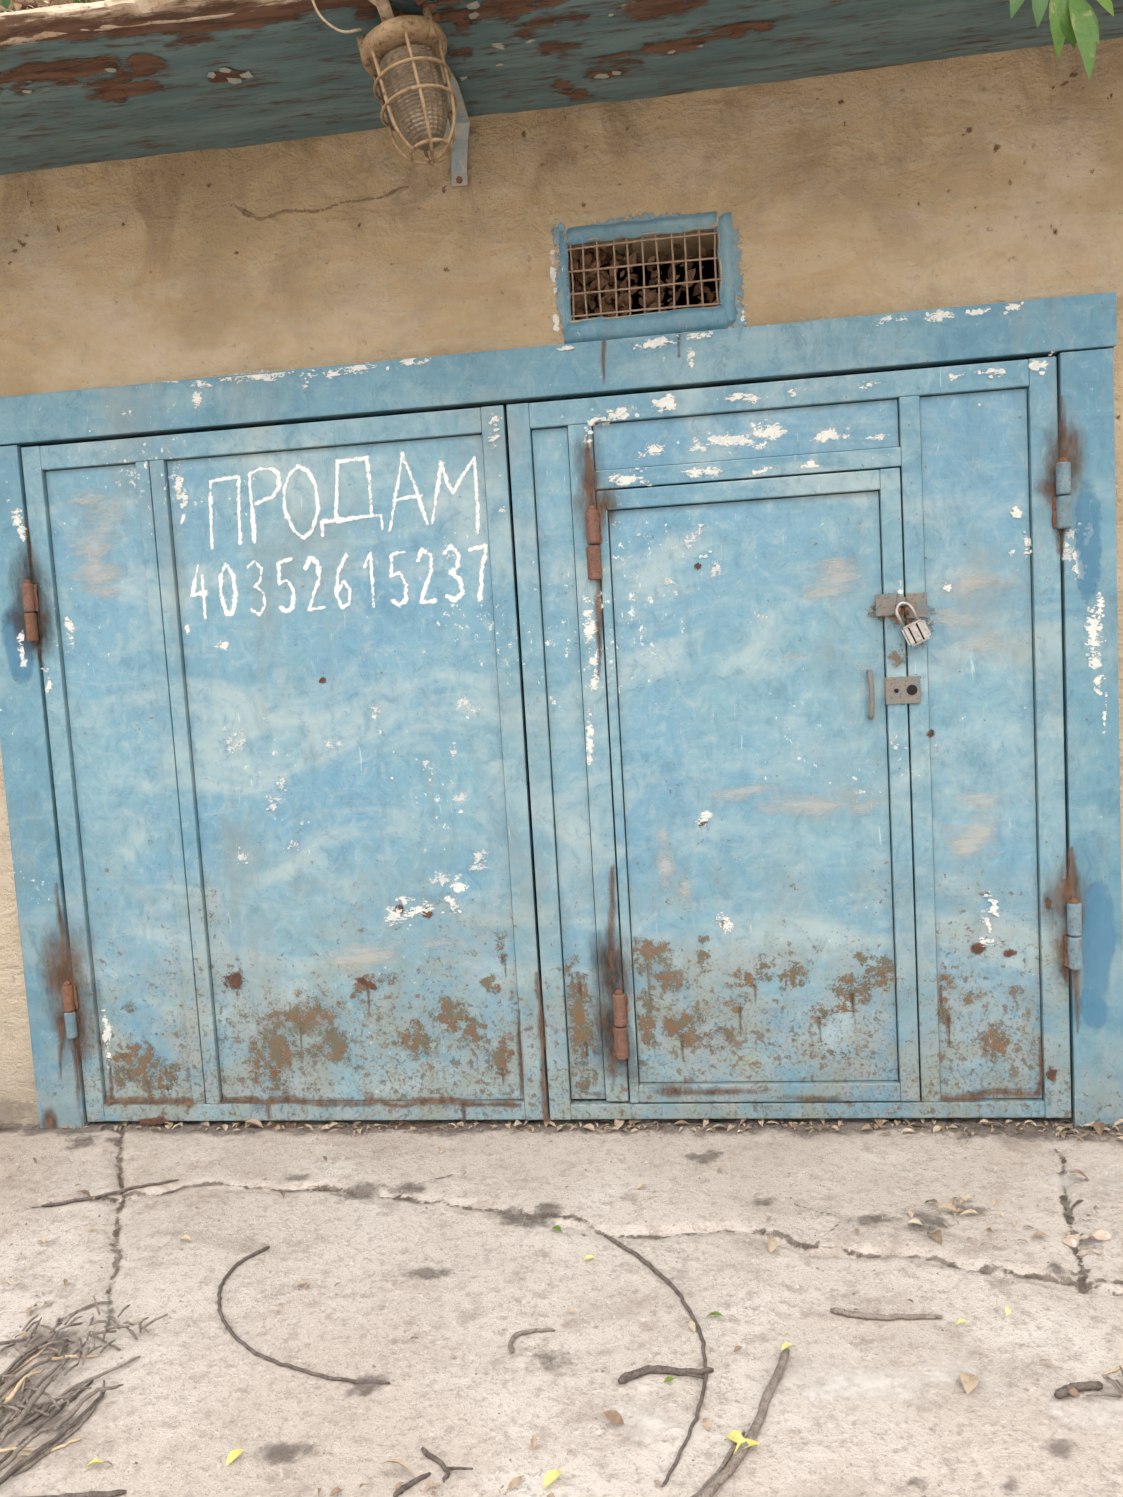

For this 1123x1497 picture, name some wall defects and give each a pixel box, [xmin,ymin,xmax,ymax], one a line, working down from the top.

peeling [0,0,405,103]
peeling [583,393,677,450]
peeling [609,388,811,486]
peeling [582,591,604,765]
peeling [1084,592,1108,733]
peeling [384,847,492,926]
rust [222,968,245,997]
rust [564,867,804,1093]
rust [809,950,899,1059]
rust [971,943,986,954]
rust [105,1041,193,1125]
rust [222,992,523,1128]